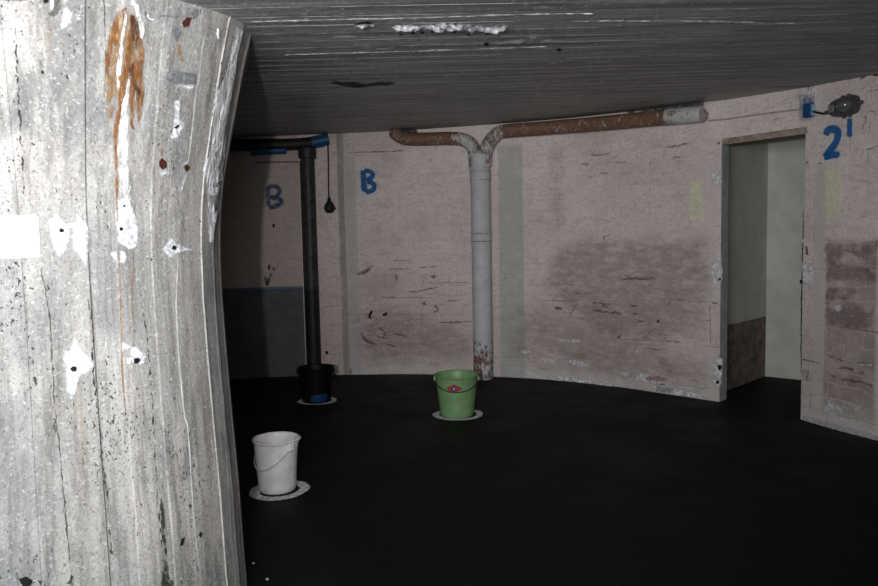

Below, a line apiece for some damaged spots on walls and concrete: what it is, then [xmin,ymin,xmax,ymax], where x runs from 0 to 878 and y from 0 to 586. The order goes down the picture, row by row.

rust [106,0,144,147]
spalling [393,22,561,51]